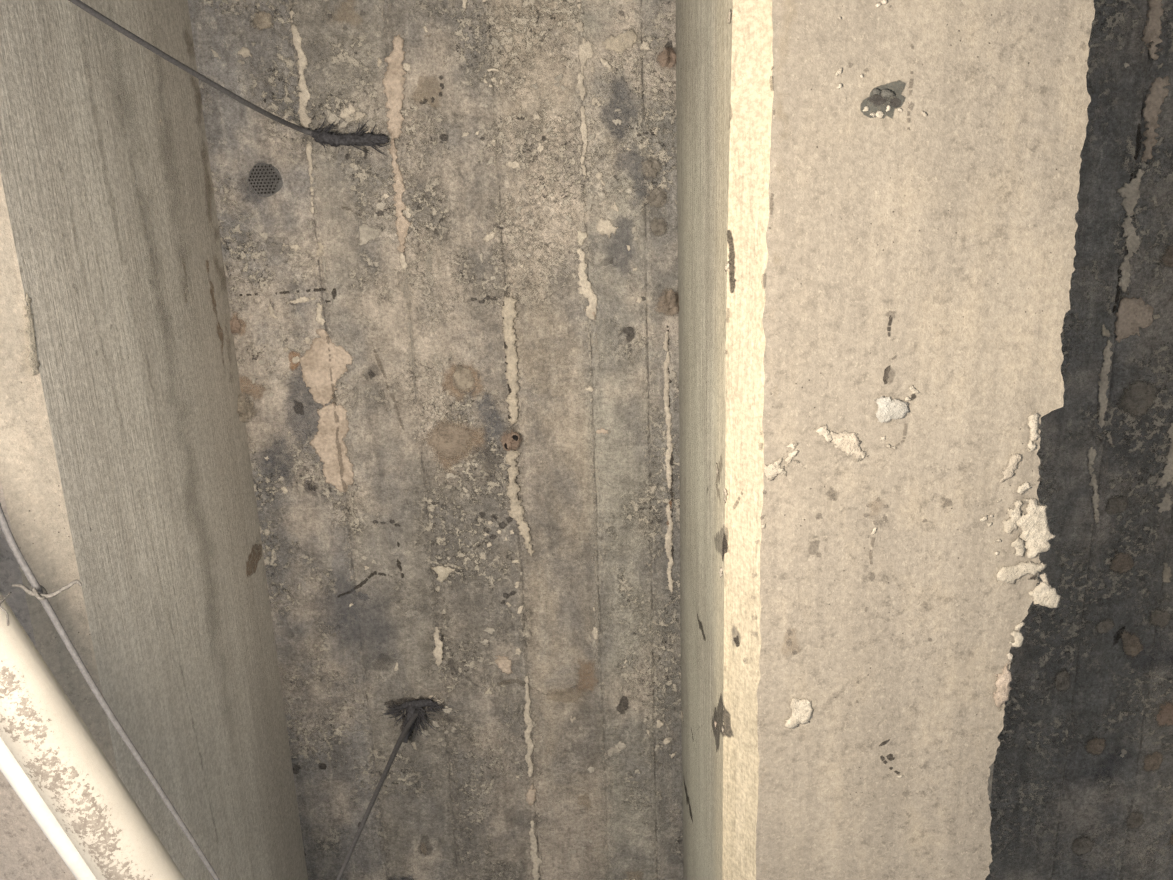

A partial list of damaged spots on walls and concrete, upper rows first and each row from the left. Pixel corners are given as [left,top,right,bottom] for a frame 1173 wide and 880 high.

peeling [863,105,903,118]
water stain [1097,0,1171,447]
peeling [282,303,355,493]
spalling [815,424,869,462]
spalling [874,366,919,449]
spalling [980,411,1061,608]
water stain [1087,447,1100,524]
water stain [1155,423,1173,513]
spalling [993,622,1025,712]
spalling [784,697,813,729]